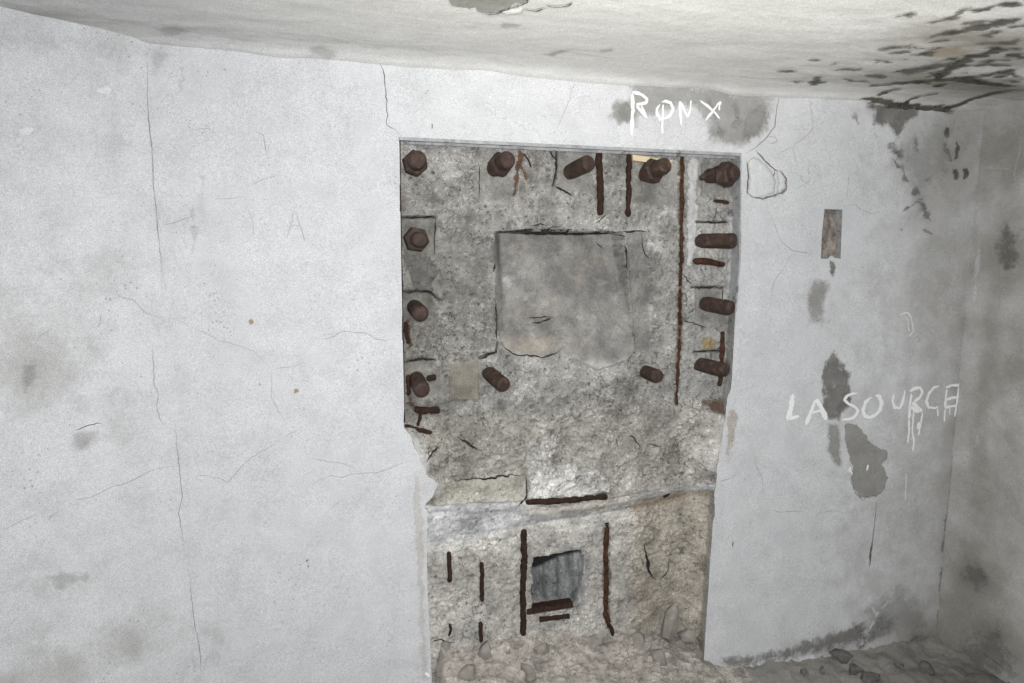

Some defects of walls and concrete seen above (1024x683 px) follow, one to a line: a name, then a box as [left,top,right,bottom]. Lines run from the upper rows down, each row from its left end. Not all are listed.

peeling [449,0,573,15]
damp [613,86,766,144]
damp [868,104,917,135]
crack [147,61,276,290]
corrosion [513,151,528,195]
damp [944,128,969,180]
corrosion [674,161,685,400]
crack [317,331,435,363]
crack [1,294,302,538]
corrosion [703,399,724,414]
damp [822,352,851,465]
crack [310,437,478,505]